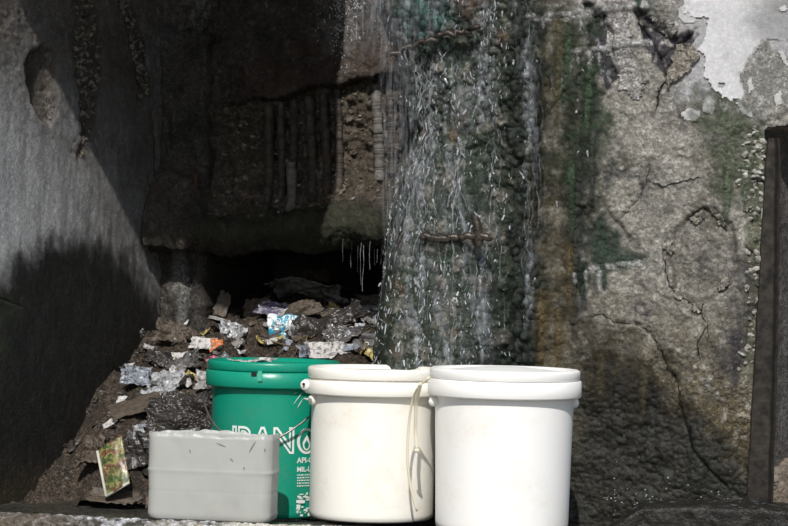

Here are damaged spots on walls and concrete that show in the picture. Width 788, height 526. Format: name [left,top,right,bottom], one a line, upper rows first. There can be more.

spalling [73,0,102,158]
leakage [403,0,428,54]
crack [636,14,696,113]
spalling [206,79,414,218]
rust [418,213,493,248]
peeling [584,0,788,375]
crack [662,248,709,359]
leakage [0,236,161,505]
crack [591,314,690,436]